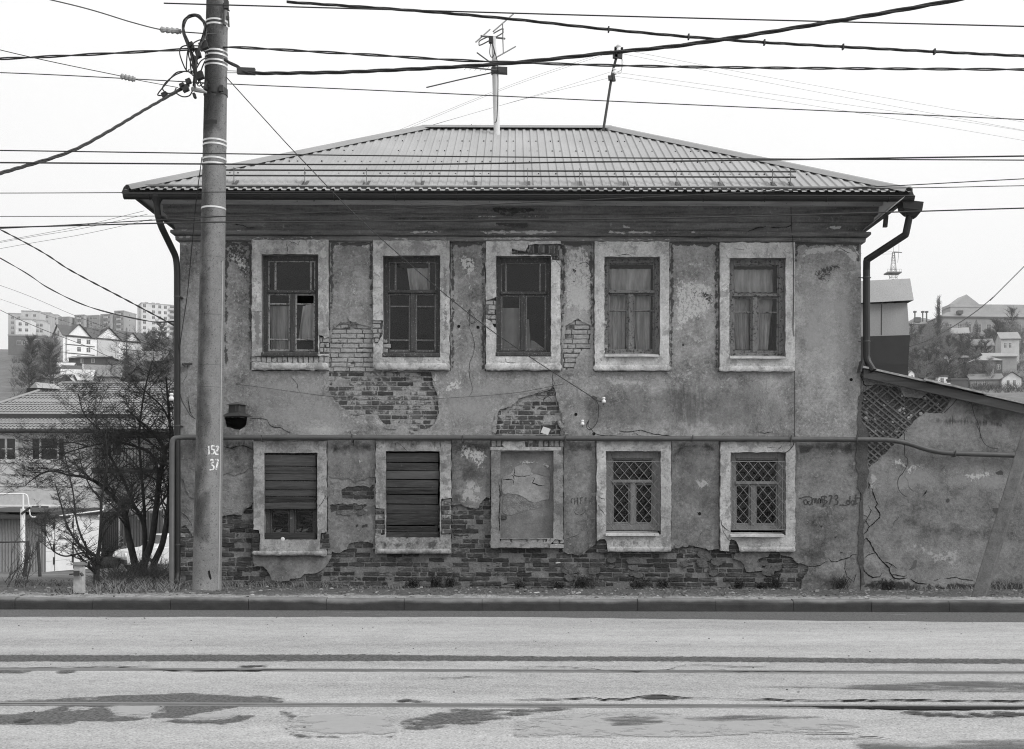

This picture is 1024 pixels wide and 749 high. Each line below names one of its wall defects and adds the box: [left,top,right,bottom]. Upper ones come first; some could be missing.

flaking render [251,258,462,433]
flaking render [479,207,694,390]
flaking render [208,387,810,589]
crack [810,482,973,584]
flaking render [861,384,951,489]